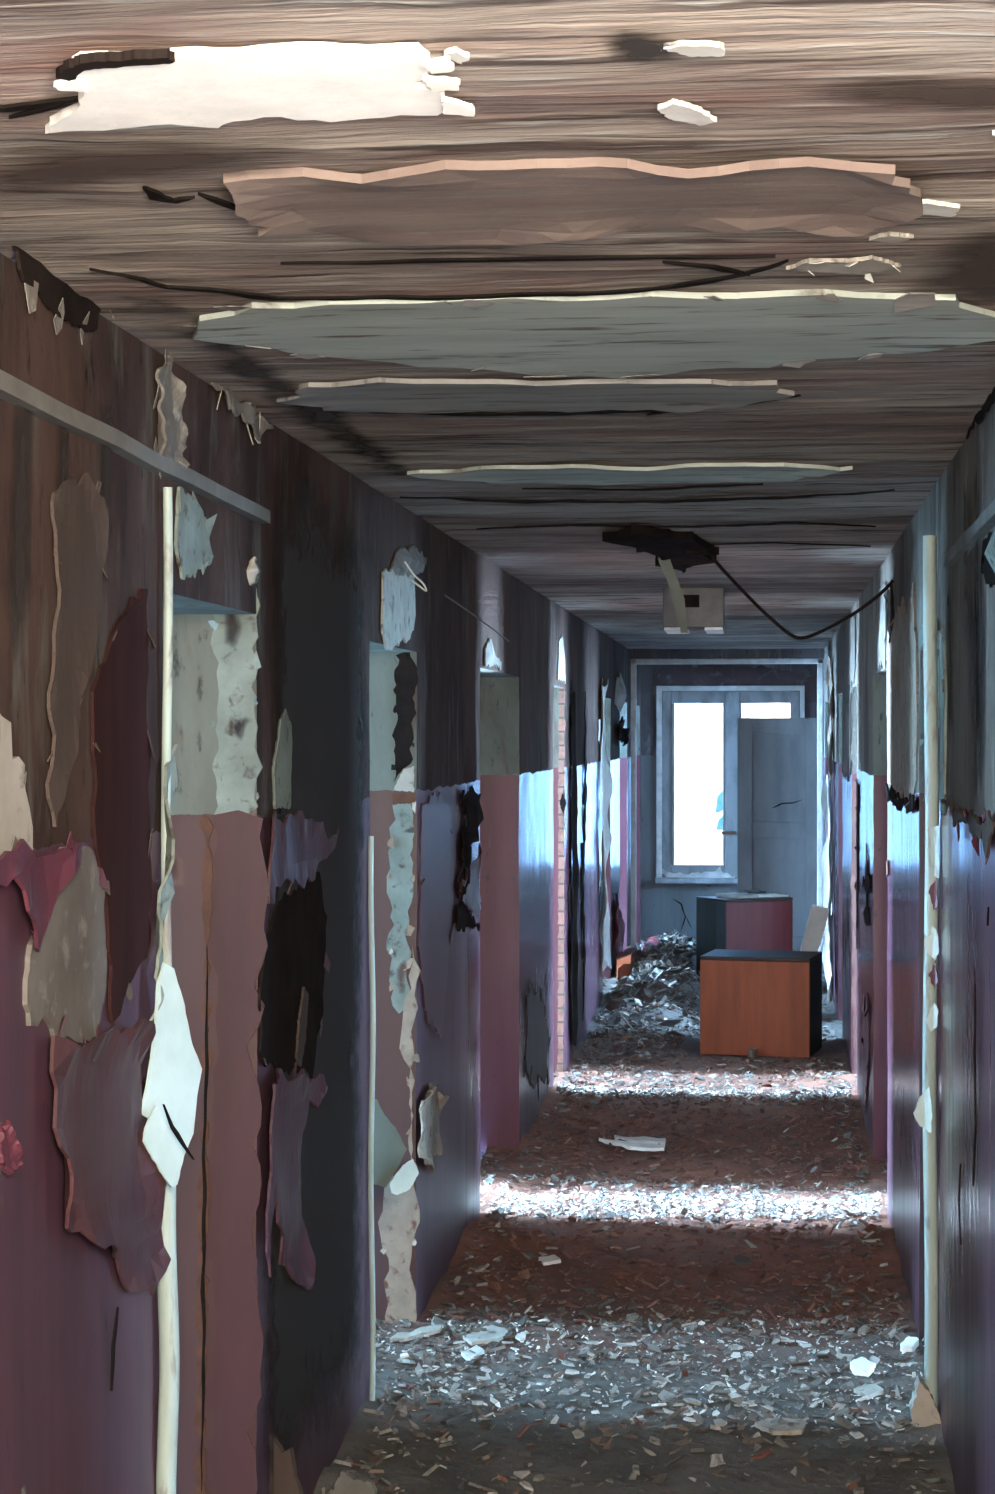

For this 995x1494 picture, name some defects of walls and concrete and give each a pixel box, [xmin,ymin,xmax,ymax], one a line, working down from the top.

flaking render [45,41,475,134]
peeling [657,98,717,126]
peeling [664,40,725,57]
crack [89,255,789,301]
peeling [878,580,995,1032]
peeling [374,544,484,1322]
peeling [0,473,340,1494]